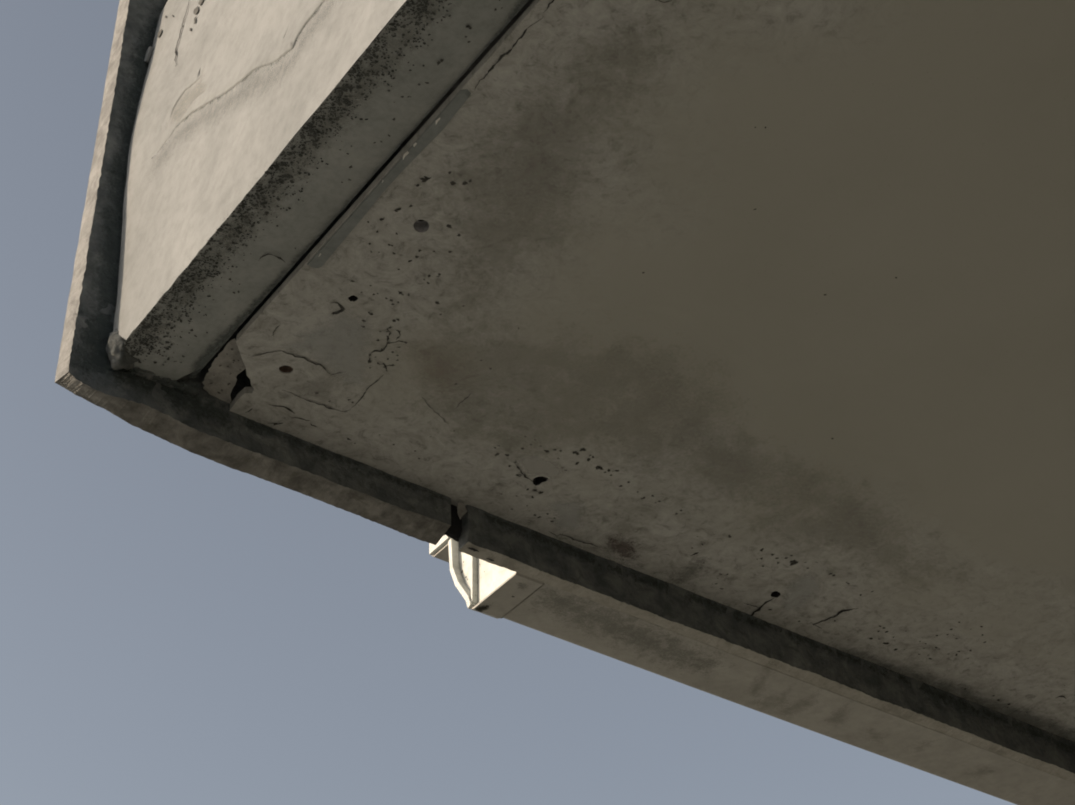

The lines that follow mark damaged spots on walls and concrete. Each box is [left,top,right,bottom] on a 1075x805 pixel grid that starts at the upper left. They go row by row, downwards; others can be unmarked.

damp [74,0,448,425]
crack [256,326,344,376]
crack [283,328,408,412]